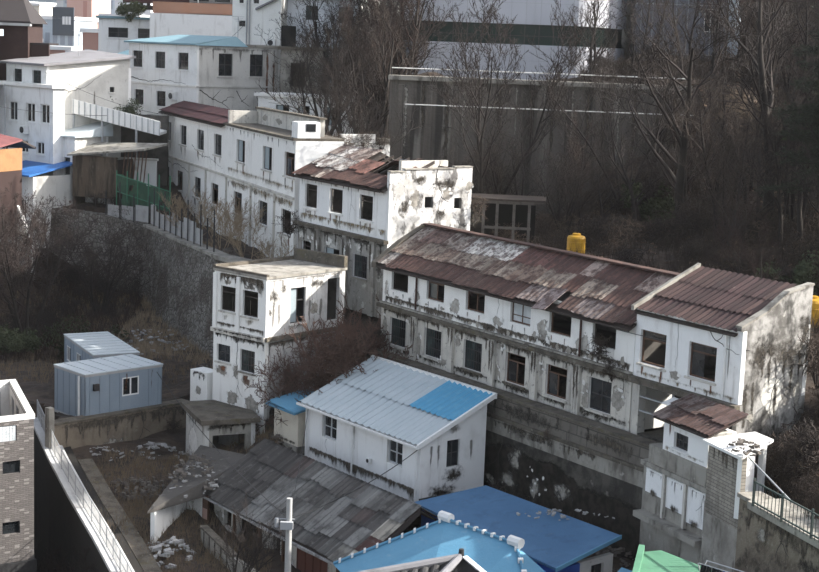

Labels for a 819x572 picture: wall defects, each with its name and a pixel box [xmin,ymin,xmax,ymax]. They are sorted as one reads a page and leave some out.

peeling [408,189,419,207]
peeling [220,273,264,298]
water stain [215,316,314,355]
water stain [269,273,336,326]
spalling [384,280,629,371]
peeling [214,363,274,435]
water stain [742,316,812,428]
water stain [309,447,414,501]